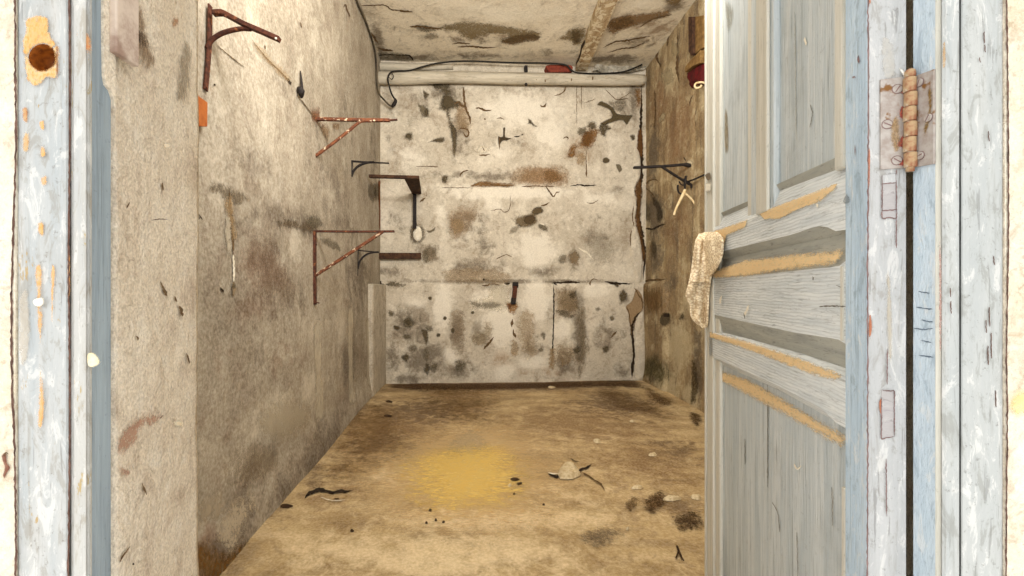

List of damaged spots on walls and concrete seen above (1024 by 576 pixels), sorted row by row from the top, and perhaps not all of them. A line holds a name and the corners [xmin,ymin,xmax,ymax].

peeling [23,16,59,85]
water stain [410,22,540,49]
water stain [560,28,586,45]
water stain [608,0,681,34]
rust [568,129,598,165]
water stain [516,170,561,230]
crack [549,14,696,376]
peeling [626,288,644,336]
water stain [389,290,672,404]
water stain [690,360,701,426]
rust [118,415,160,451]
water stain [377,426,552,523]